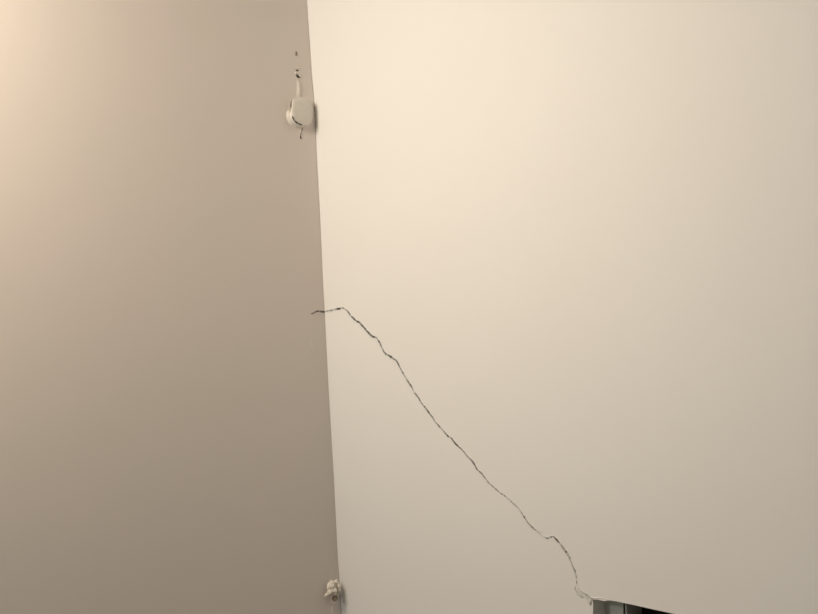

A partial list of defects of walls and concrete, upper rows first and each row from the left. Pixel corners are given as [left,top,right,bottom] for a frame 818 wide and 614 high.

crack [310,306,593,599]